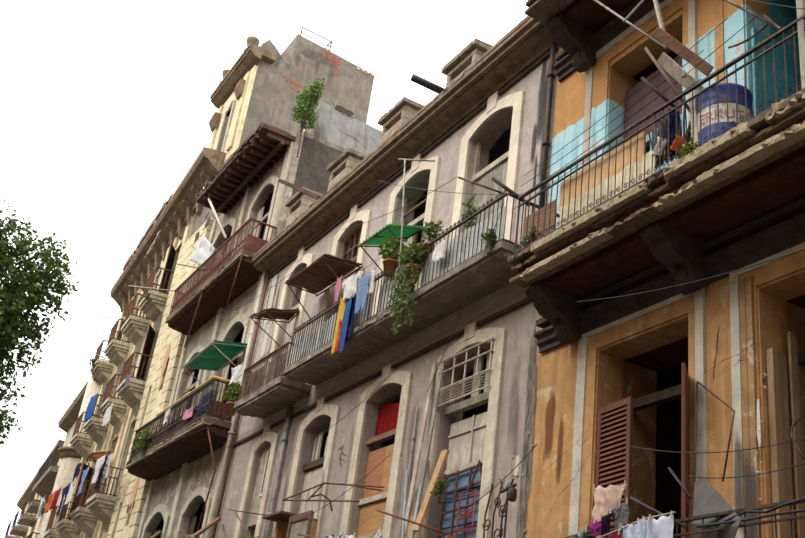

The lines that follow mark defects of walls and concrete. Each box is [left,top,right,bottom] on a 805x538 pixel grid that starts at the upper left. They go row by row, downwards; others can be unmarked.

flaking render [323,48,341,76]
crack [703,326,760,378]
leakage [543,395,563,480]